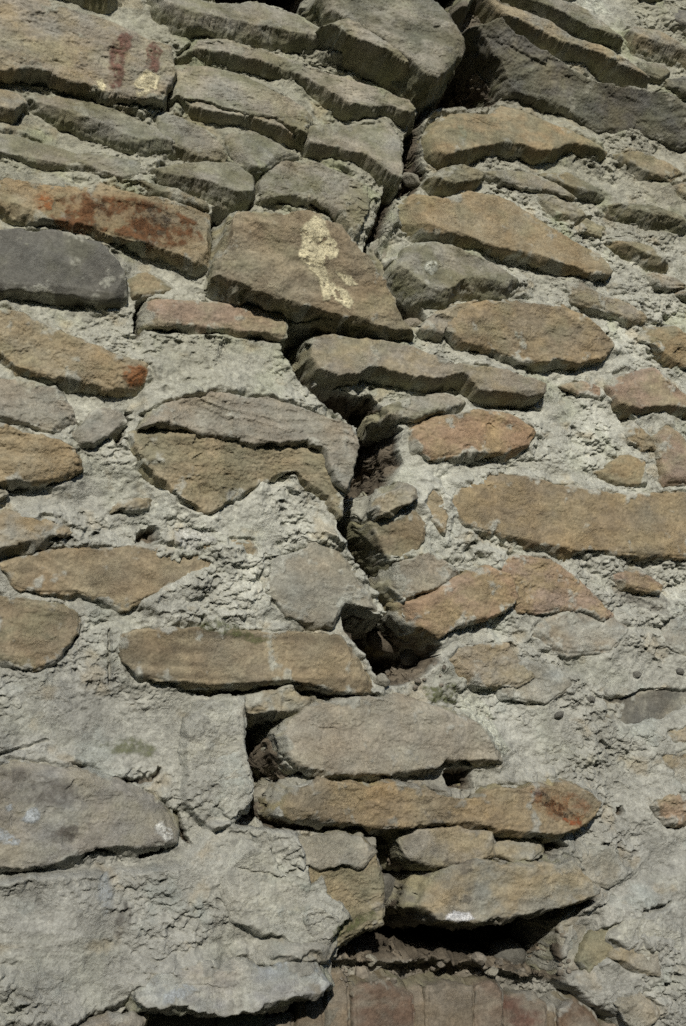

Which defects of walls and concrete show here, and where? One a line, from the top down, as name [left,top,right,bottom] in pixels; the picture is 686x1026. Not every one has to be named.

crack [434,0,449,8]
crack [363,70,502,270]
crack [403,307,428,322]
crack [280,345,404,532]
crack [264,685,320,695]
crack [336,597,449,696]
crack [185,688,323,834]
crack [350,825,372,838]